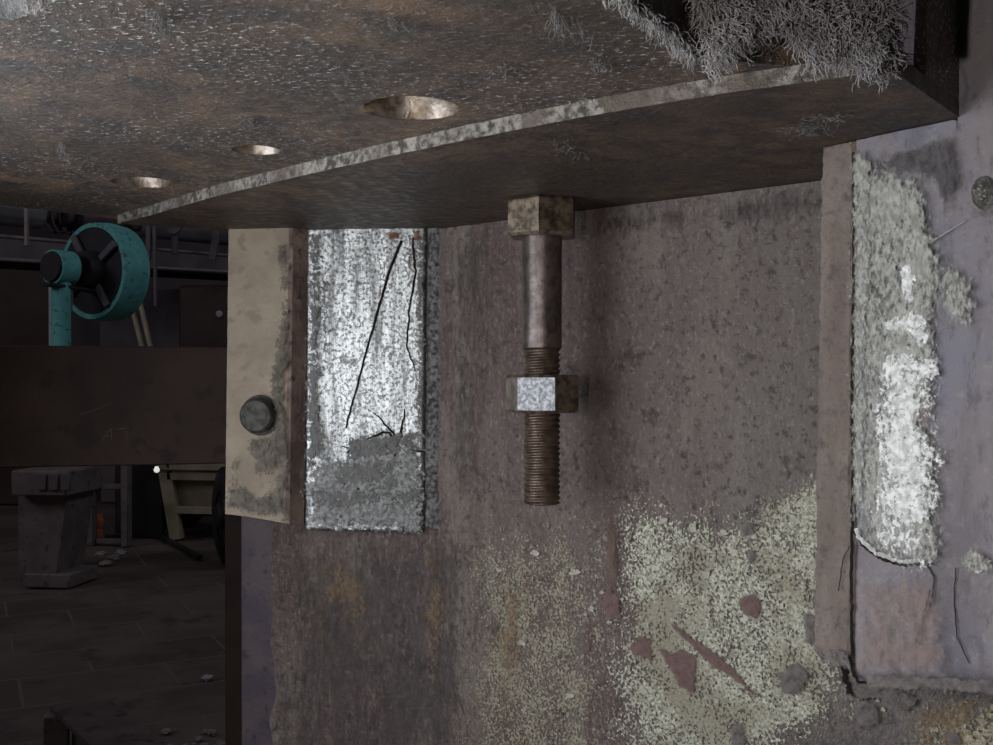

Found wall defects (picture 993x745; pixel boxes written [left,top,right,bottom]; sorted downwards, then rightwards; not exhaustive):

crack [834,152,970,701]
damp [876,139,958,213]